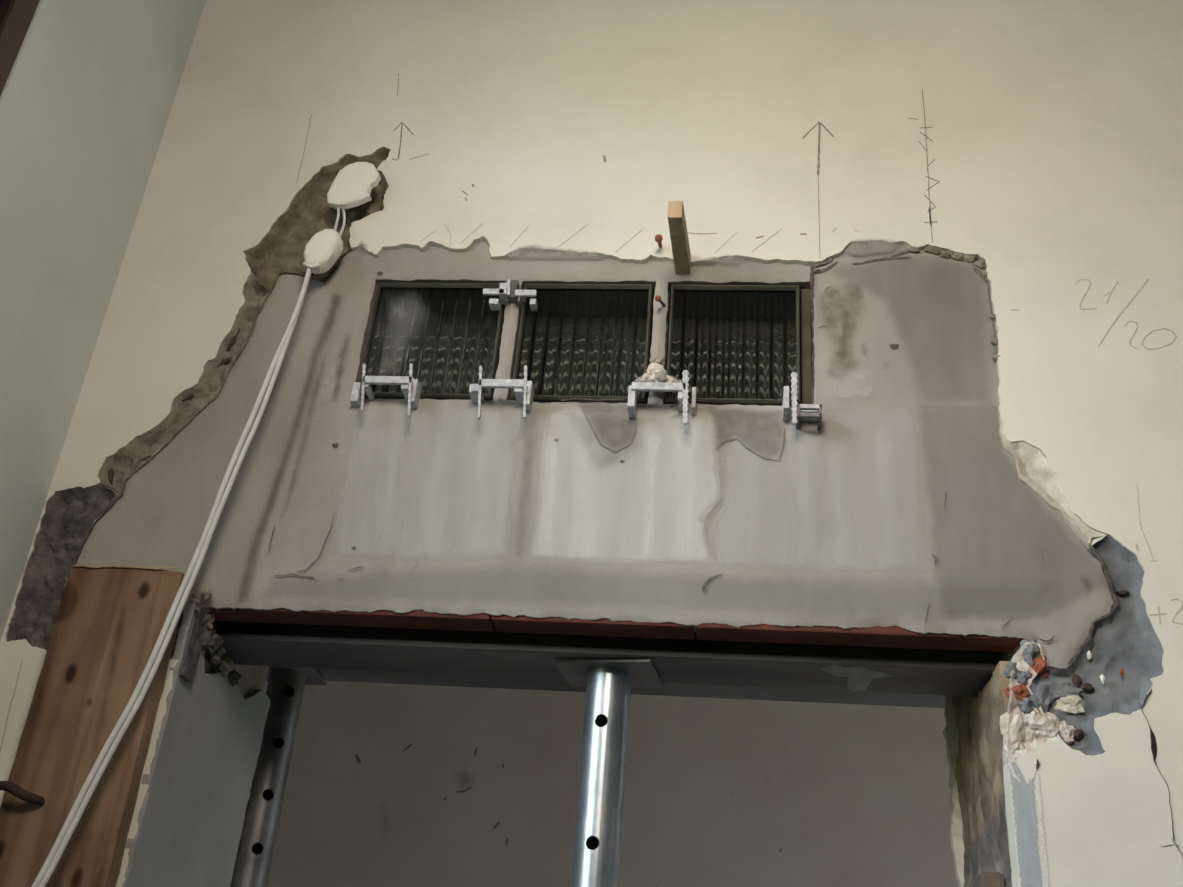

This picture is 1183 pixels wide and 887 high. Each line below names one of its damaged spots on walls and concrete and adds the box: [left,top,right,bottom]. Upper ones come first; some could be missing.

spalling [813,256,837,274]
spalling [852,245,1001,361]
spalling [7,265,271,650]
water stain [551,407,636,557]
spalling [170,607,205,683]
spalling [943,412,1164,887]
crack [1139,689,1183,858]